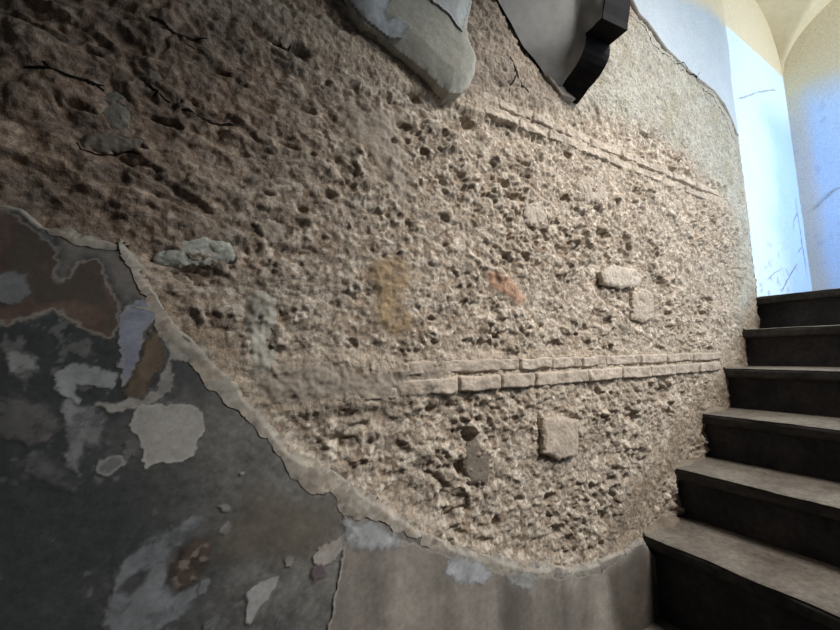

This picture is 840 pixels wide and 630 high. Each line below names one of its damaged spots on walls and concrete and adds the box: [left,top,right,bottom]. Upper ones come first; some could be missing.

crack [23,60,109,92]
crack [150,16,207,50]
crack [139,79,238,127]
peeling [0,208,156,387]
spalling [47,225,244,413]
water stain [371,258,411,333]
corrosion [486,270,526,303]
peeling [54,363,118,472]
peeling [95,338,205,476]
spalling [241,397,421,538]
spalling [457,440,490,486]
peeling [312,533,658,630]